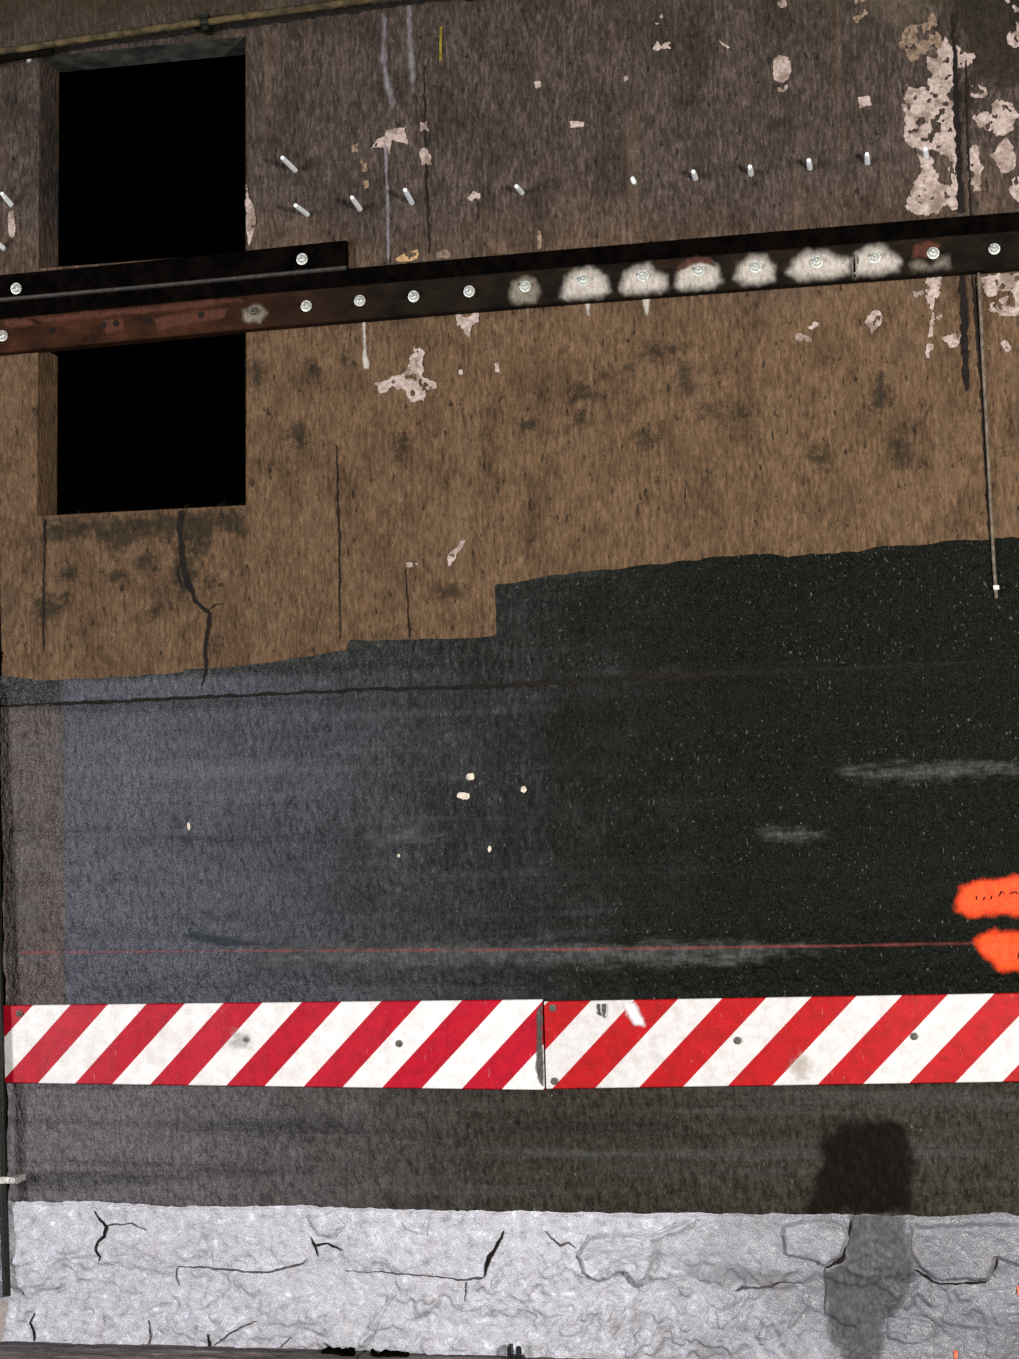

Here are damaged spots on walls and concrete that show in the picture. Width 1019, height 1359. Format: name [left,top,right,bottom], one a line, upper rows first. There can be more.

peeling [1005,0,1019,48]
peeling [899,12,1019,216]
corrosion [3,299,243,334]
water stain [510,277,538,314]
water stain [563,262,720,315]
water stain [736,247,947,284]
peeling [981,273,1019,316]
peeling [374,347,437,402]
crack [0,510,1017,707]
crack [94,1211,147,1262]
crack [176,1231,504,1297]
crack [735,1220,852,1317]